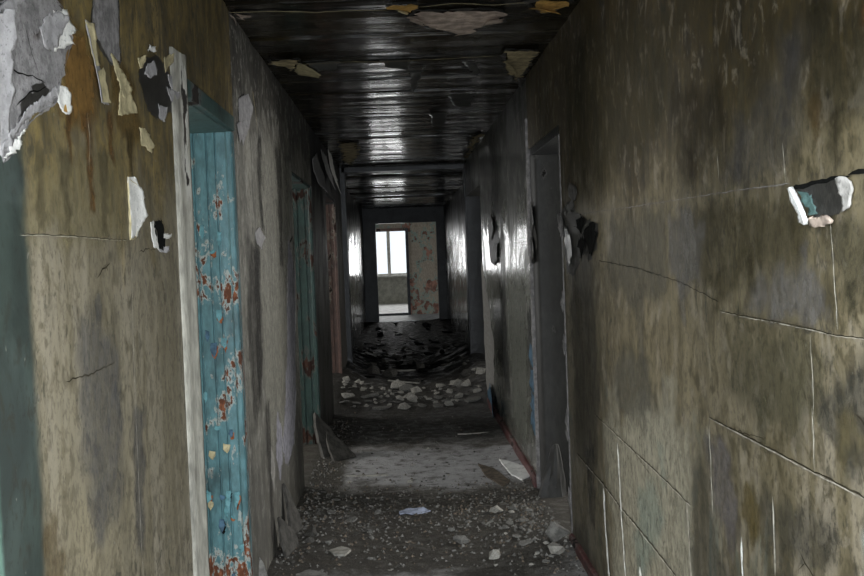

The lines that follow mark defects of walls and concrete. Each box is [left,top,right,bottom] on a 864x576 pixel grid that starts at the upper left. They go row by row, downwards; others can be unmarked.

peeling [385,1,508,36]
peeling [0,0,122,163]
peeling [118,44,181,122]
peeling [268,57,341,78]
peeling [139,127,155,153]
peeling [127,176,172,253]
spalling [786,175,854,228]
crack [848,168,864,176]
peeling [557,134,598,533]
crack [600,260,864,340]
leakage [604,359,693,576]
crack [709,417,864,499]